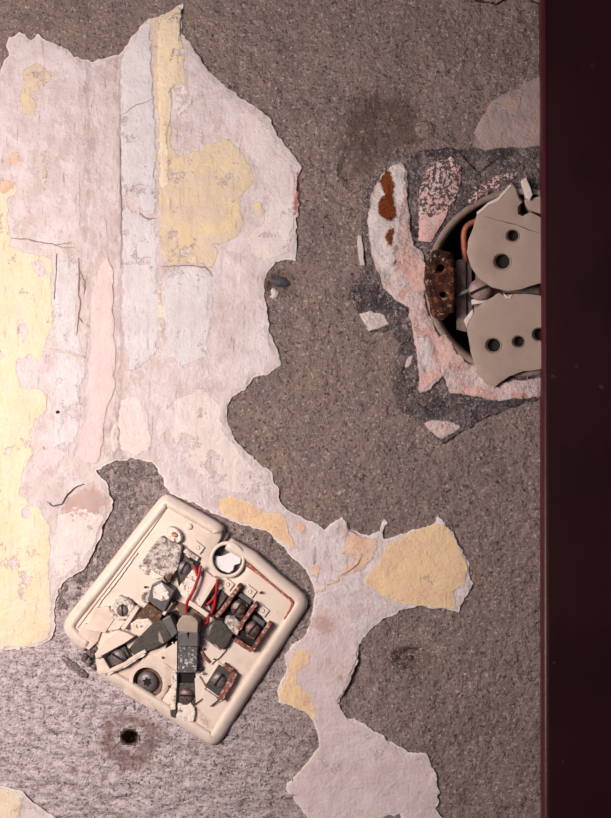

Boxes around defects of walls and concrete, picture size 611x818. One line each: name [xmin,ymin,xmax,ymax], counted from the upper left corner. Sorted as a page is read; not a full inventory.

crack [474,0,505,8]
peeling [0,4,474,818]
corrosion [378,170,396,246]
spalling [348,77,540,444]